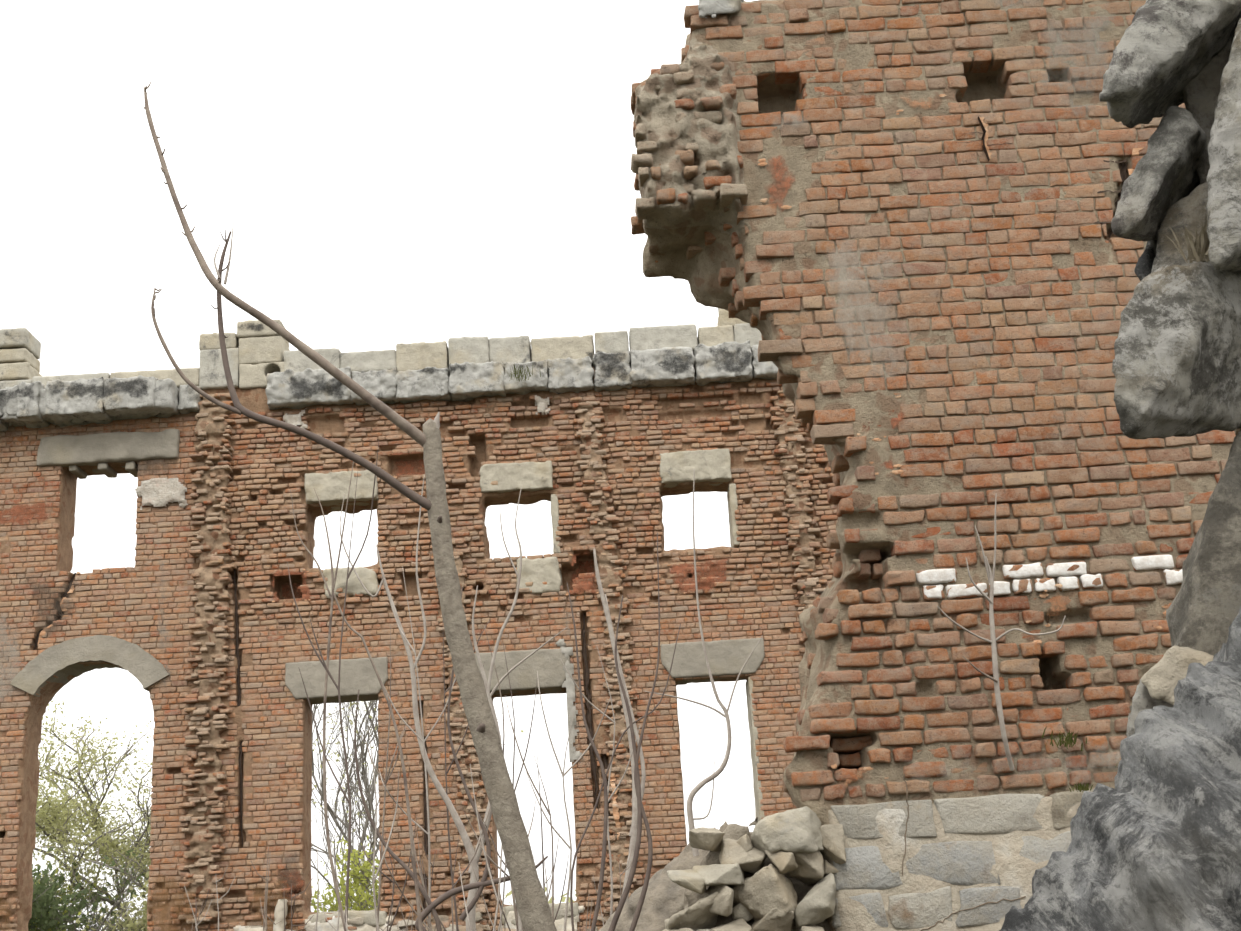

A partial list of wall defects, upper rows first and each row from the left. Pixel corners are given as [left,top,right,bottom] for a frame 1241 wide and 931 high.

crack [958,116,1012,161]
crack [1093,148,1143,237]
crack [224,569,246,706]
crack [228,741,243,848]